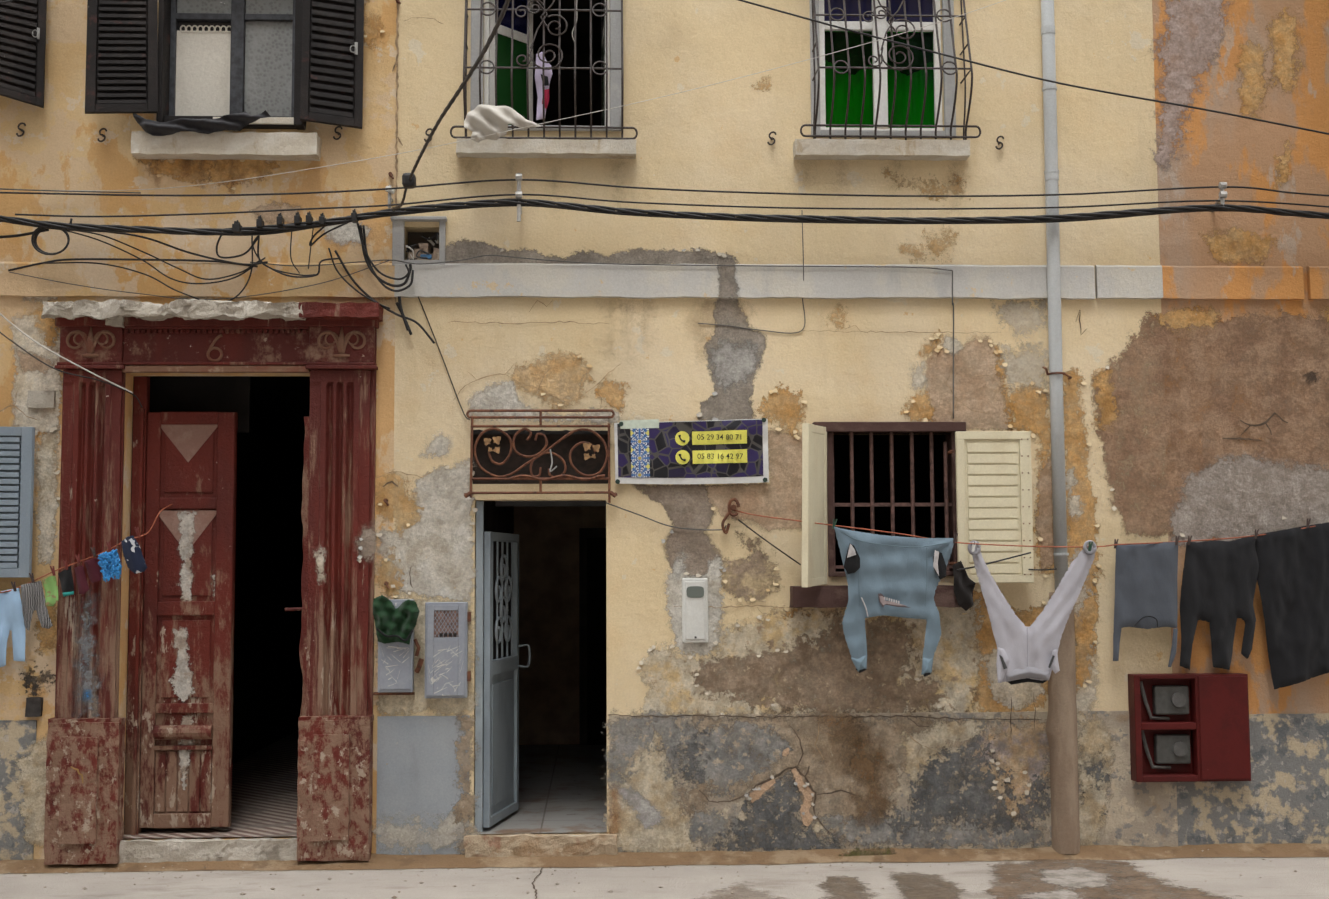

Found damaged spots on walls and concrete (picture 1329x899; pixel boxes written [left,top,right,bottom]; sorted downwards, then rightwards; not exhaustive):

peeling [509,349,631,413]
peeling [355,458,478,602]
peeling [900,305,1329,693]
flaking render [636,381,1050,843]
peeling [15,734,47,846]
peeling [602,730,699,853]
crack [608,698,1042,833]